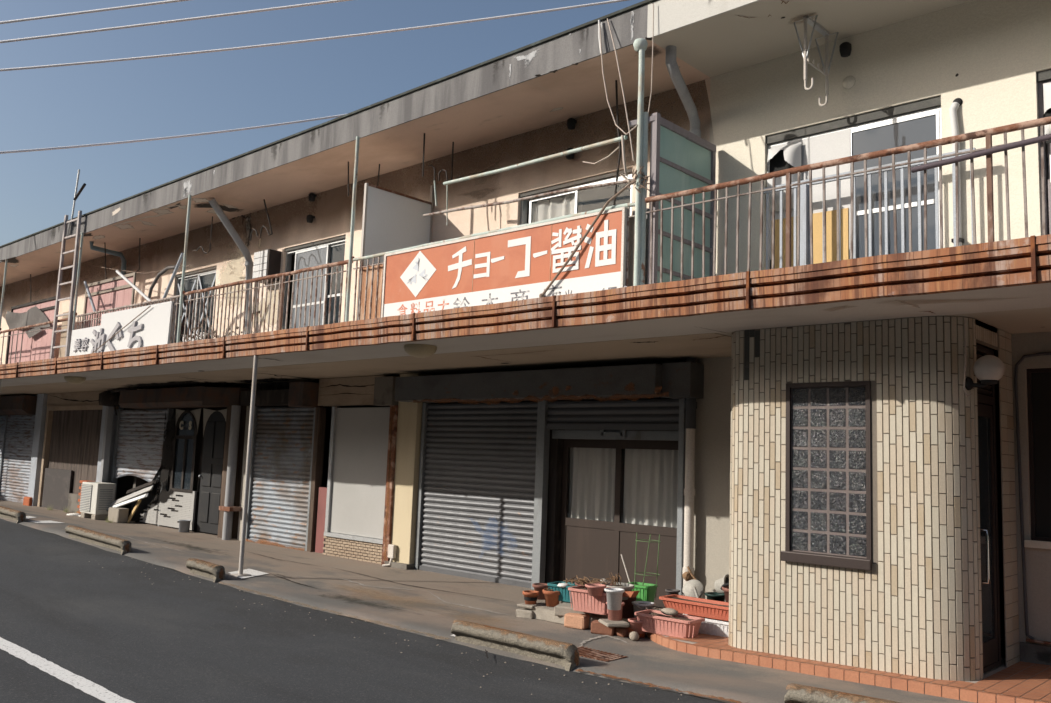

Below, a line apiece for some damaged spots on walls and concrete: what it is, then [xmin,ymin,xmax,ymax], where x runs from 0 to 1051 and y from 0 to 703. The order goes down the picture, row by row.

peeling [509,51,536,76]